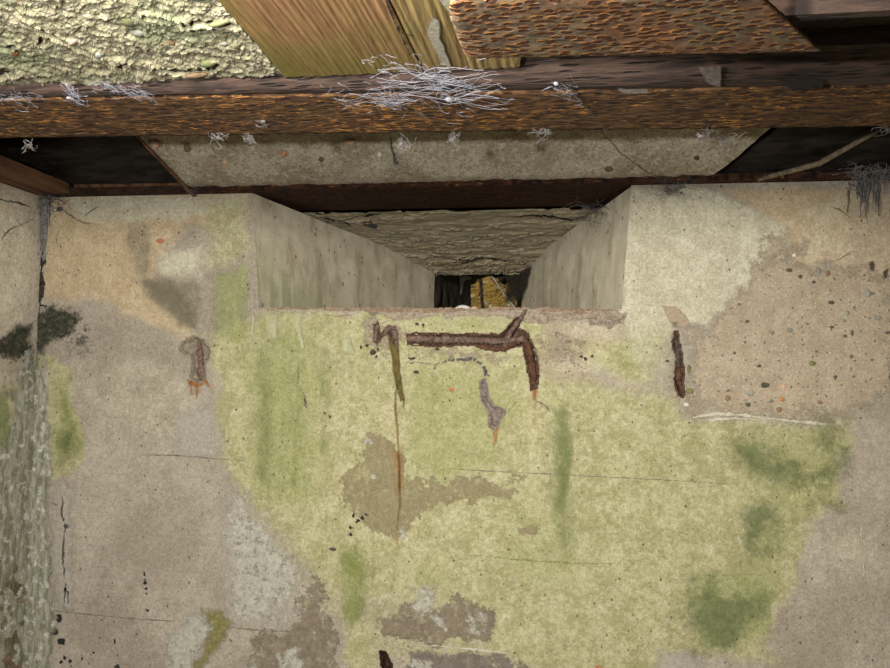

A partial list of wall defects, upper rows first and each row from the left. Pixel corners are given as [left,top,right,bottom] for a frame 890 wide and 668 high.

water stain [0,305,87,668]
spalling [662,234,890,426]